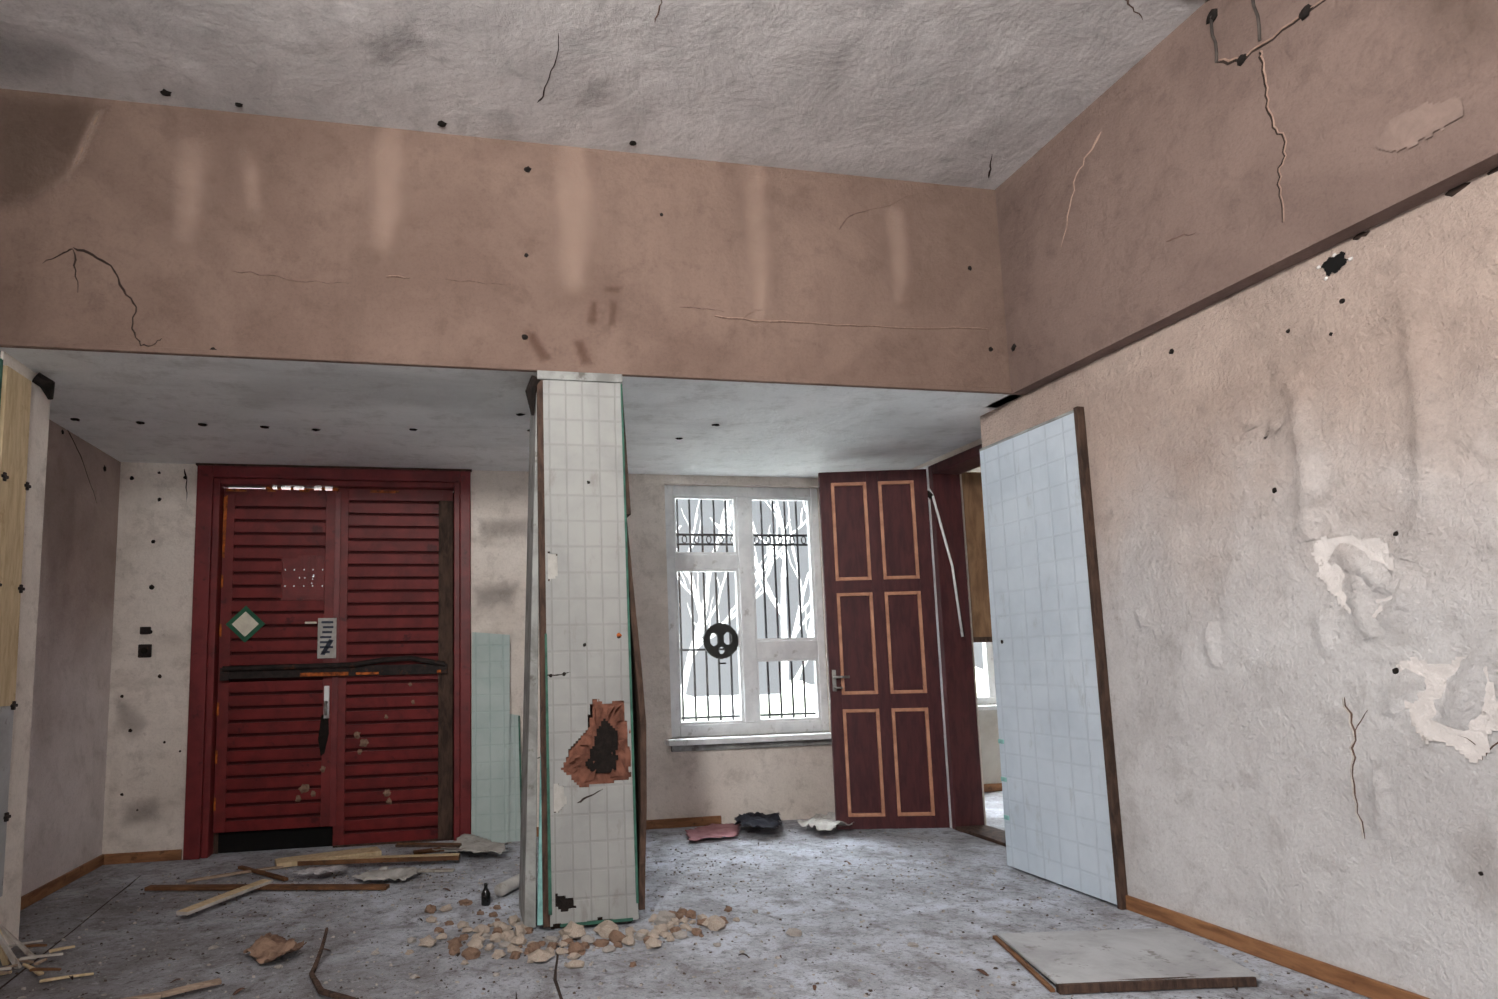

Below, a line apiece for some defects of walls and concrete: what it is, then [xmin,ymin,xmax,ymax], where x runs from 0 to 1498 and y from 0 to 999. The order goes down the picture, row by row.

crack [1217,0,1326,223]
crack [43,247,162,347]
spalling [585,718,618,773]
crack [1342,697,1368,839]